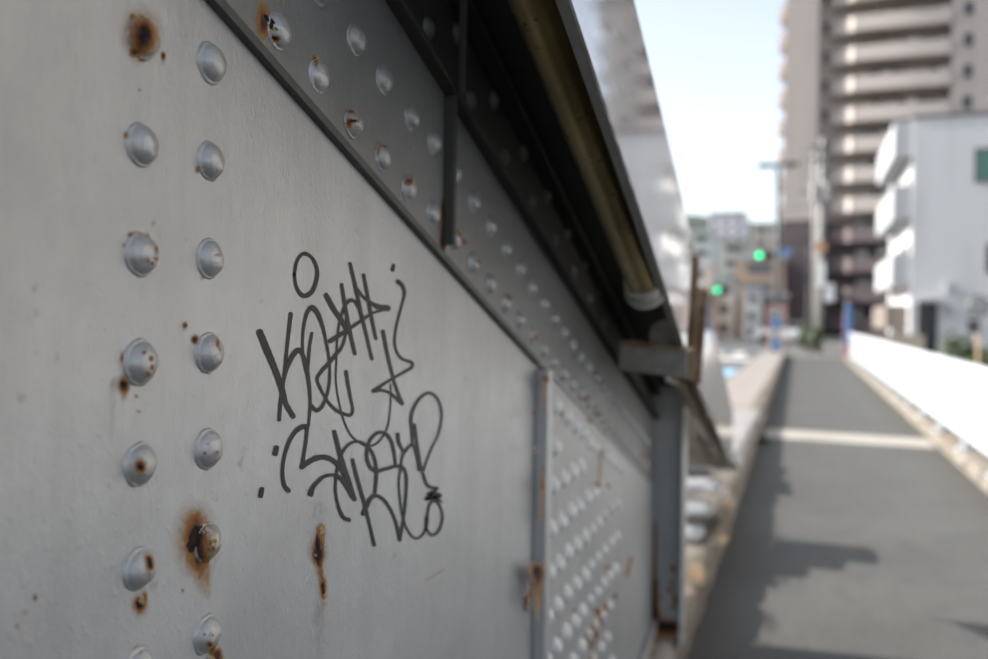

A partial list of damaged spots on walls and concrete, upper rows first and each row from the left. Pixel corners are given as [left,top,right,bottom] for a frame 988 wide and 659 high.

rust [128,14,166,61]
rust [257,4,280,42]
rust [119,377,138,397]
rust [135,460,146,473]
rust [146,555,154,571]
rust [182,511,216,581]
rust [311,525,327,598]
rust [204,634,223,659]